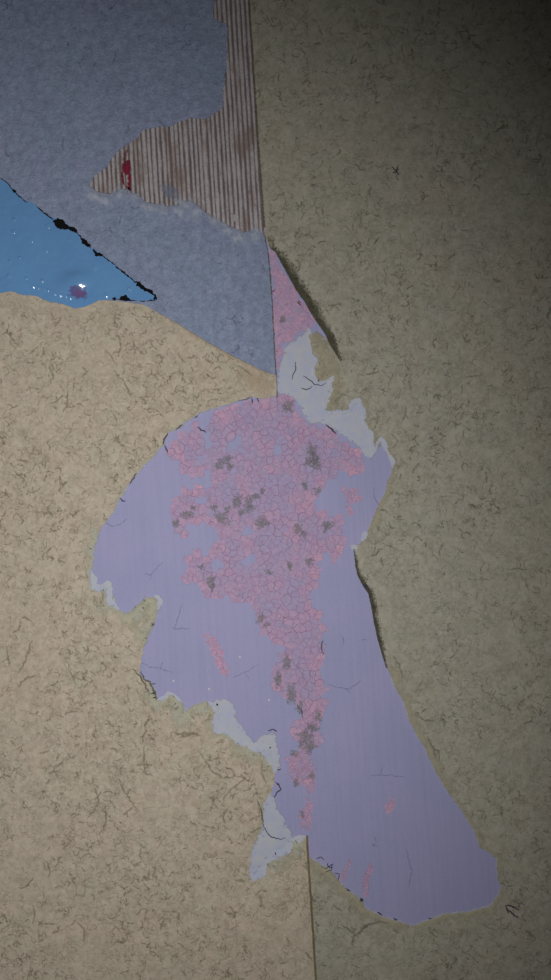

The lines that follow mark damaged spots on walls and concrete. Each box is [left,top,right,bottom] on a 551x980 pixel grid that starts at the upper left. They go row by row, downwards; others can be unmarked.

crack [177,733,283,840]
peeling [89,238,501,925]